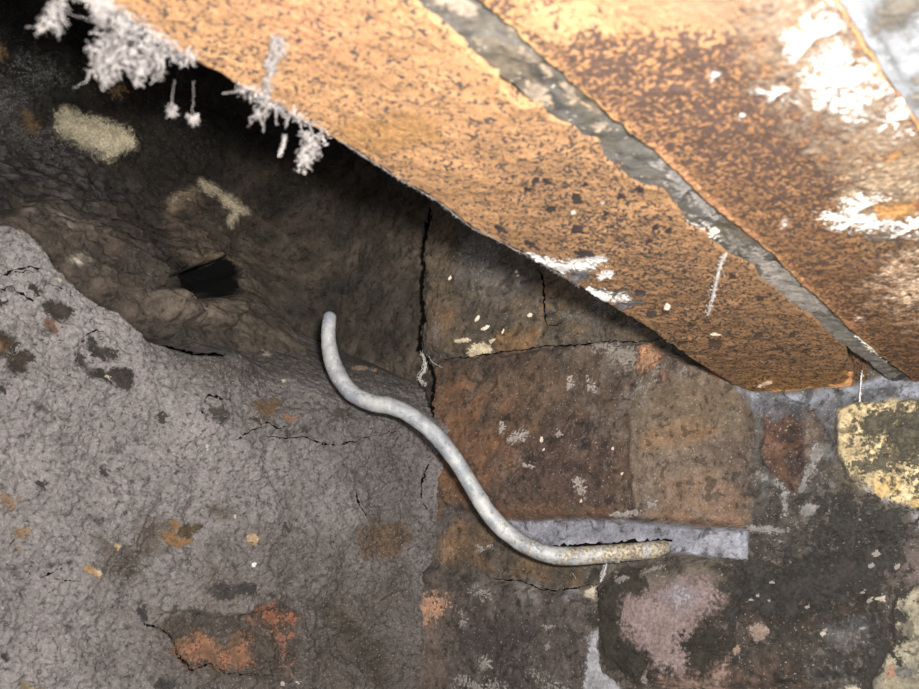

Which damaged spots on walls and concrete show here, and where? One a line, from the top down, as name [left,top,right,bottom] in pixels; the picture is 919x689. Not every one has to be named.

water stain [0,47,84,166]
water stain [730,0,919,243]
crack [416,208,662,417]
water stain [526,252,645,311]
water stain [687,214,724,243]
water stain [882,262,919,311]